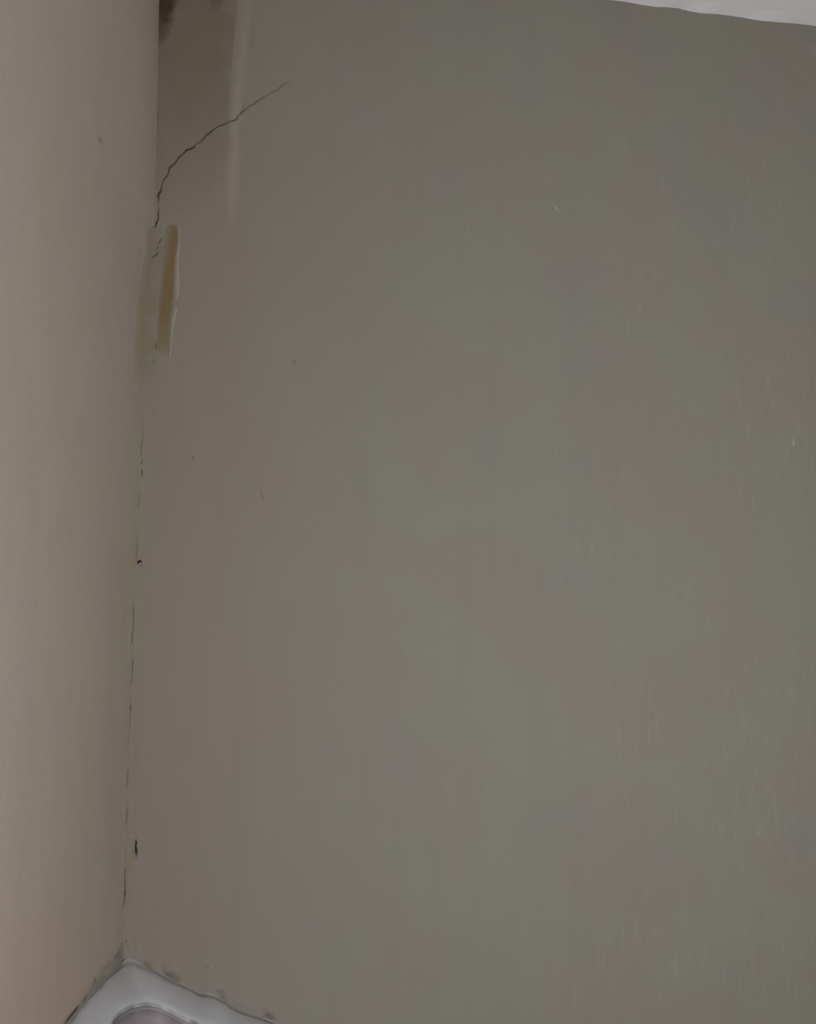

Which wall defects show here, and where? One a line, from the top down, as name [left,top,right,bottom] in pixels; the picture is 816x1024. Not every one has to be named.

crack [155,118,238,227]
peeling [157,224,180,360]